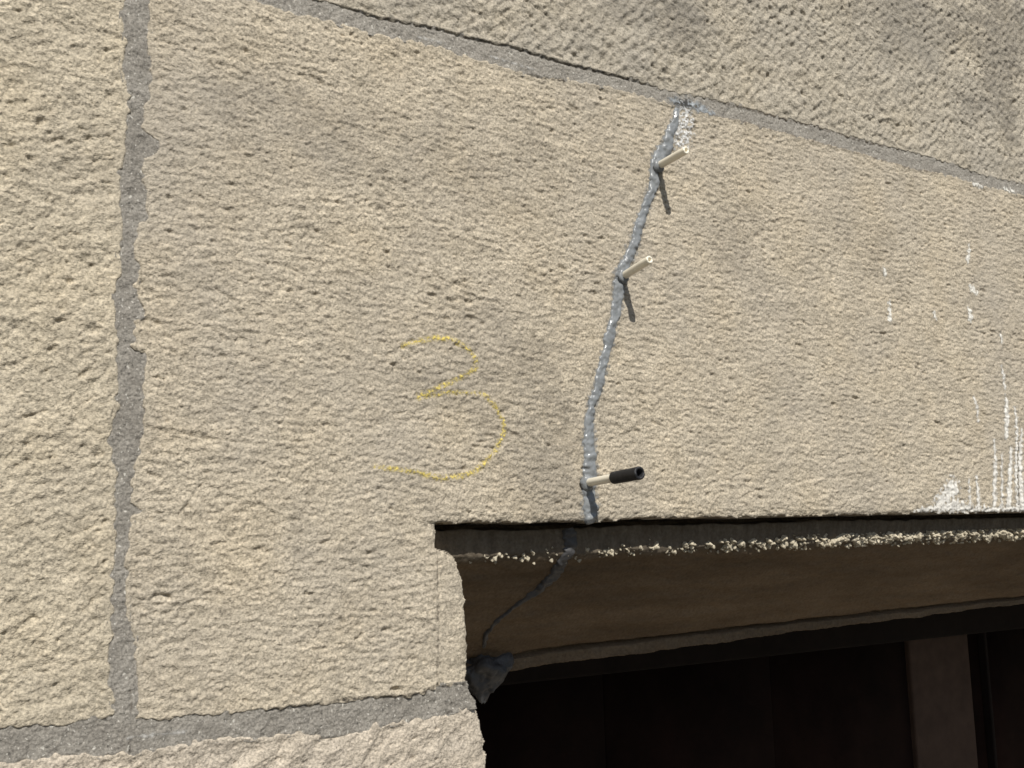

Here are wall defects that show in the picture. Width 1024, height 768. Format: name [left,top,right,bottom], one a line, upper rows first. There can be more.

crack [519,48,630,81]
crack [482,97,928,648]
water stain [913,365,1024,514]